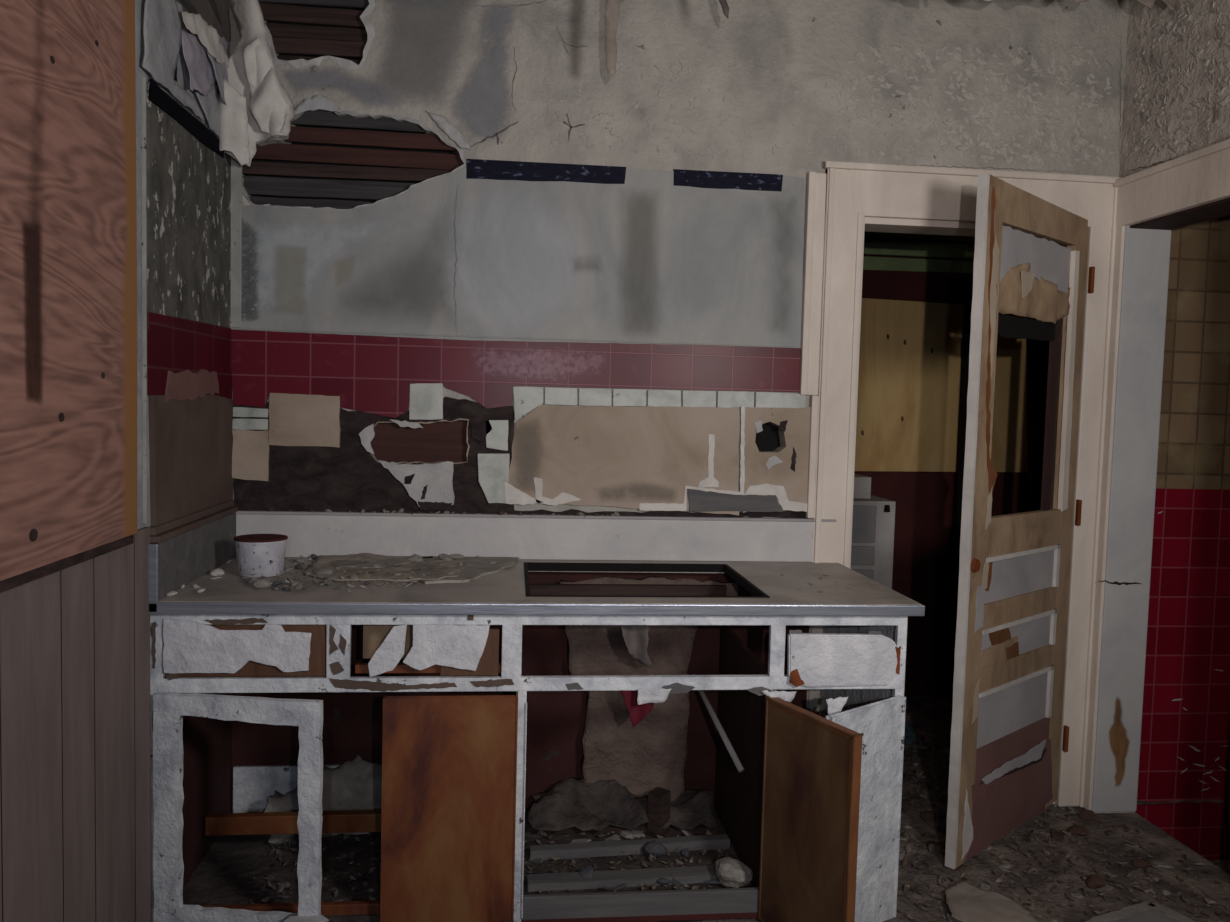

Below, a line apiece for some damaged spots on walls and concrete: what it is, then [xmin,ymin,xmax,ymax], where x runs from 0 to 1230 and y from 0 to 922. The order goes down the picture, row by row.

peeling [142,0,231,138]
spalling [257,0,376,69]
peeling [719,0,729,19]
spalling [242,95,471,211]
spalling [165,369,219,403]
peeling [233,397,806,518]
crack [1100,578,1141,586]
corrosion [1110,699,1129,785]